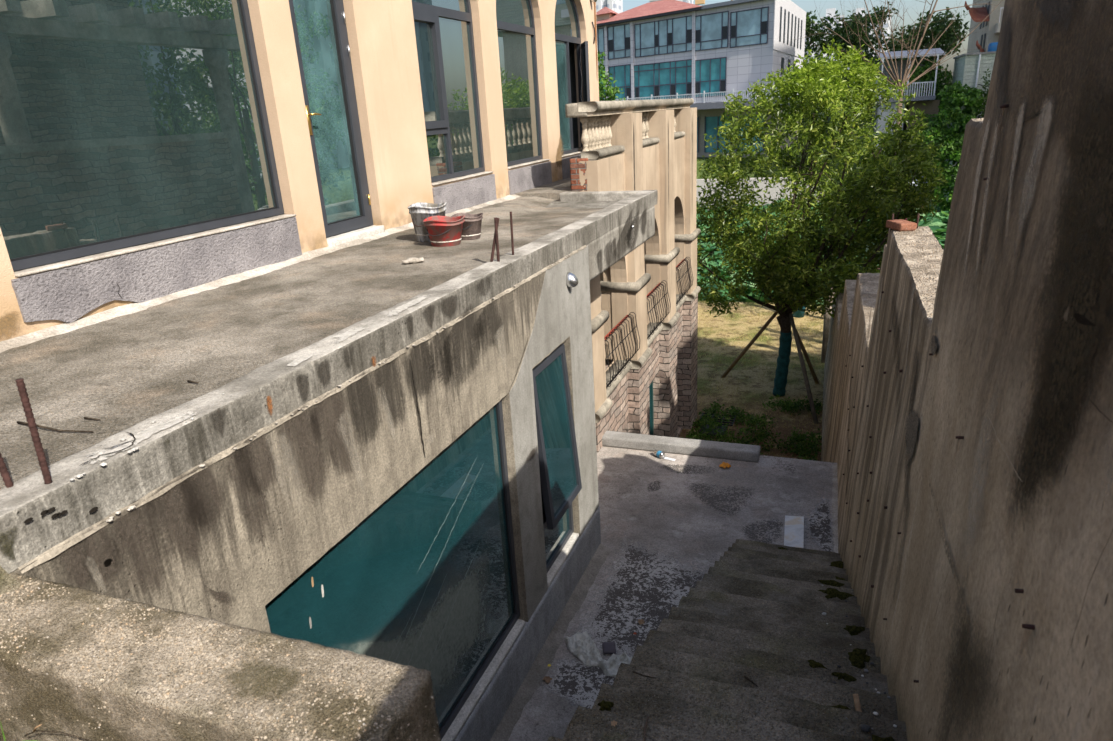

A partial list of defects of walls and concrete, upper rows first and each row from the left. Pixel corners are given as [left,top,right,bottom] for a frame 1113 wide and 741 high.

leakage [61,466,222,587]
spalling [18,245,586,574]
leakage [966,0,1113,518]